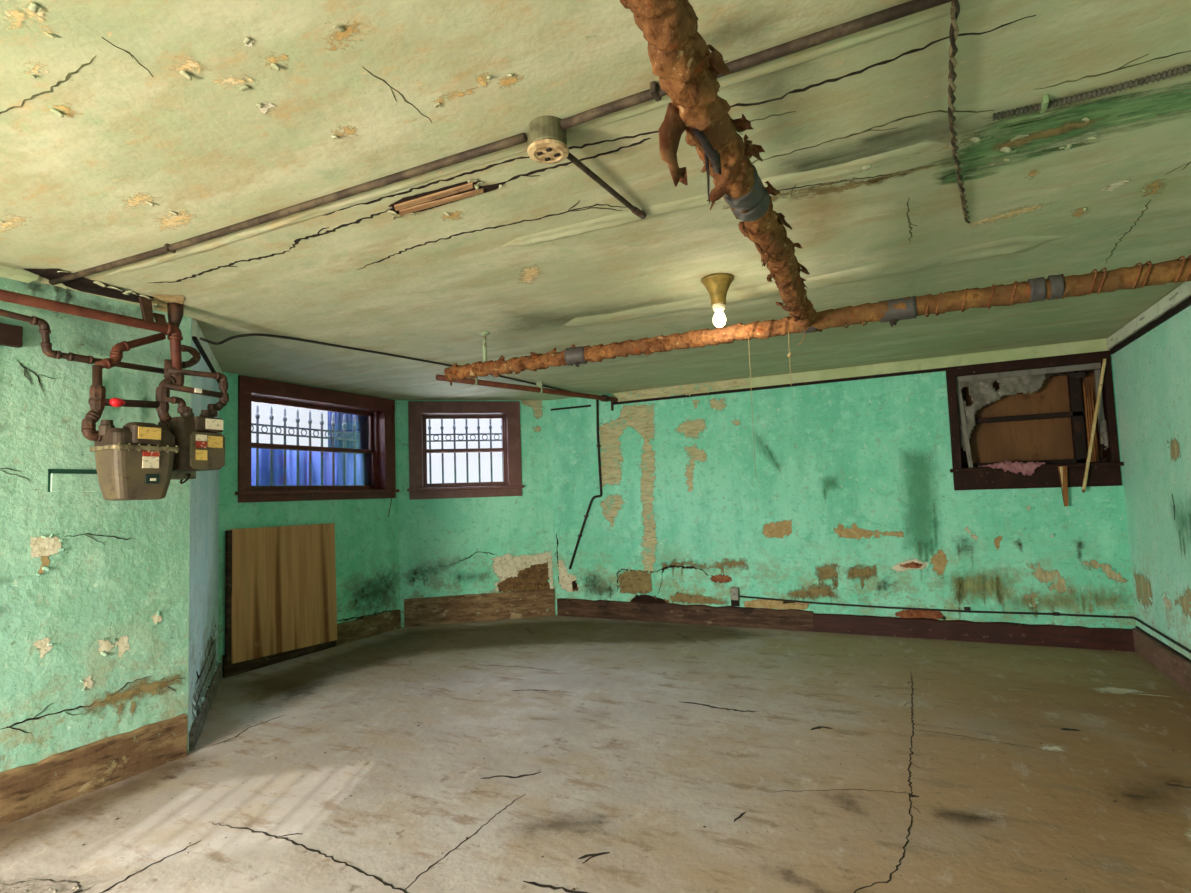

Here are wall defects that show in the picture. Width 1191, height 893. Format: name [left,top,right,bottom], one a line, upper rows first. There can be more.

crack [0,37,153,114]
crack [730,15,1036,135]
damp [771,86,1191,202]
crack [153,131,659,283]
spalling [387,179,505,220]
peeling [599,379,748,605]
peeling [761,519,793,539]
peeling [831,523,904,540]
damp [907,457,931,562]
peeling [1082,559,1191,617]
crack [2,625,216,733]
crack [0,794,525,893]